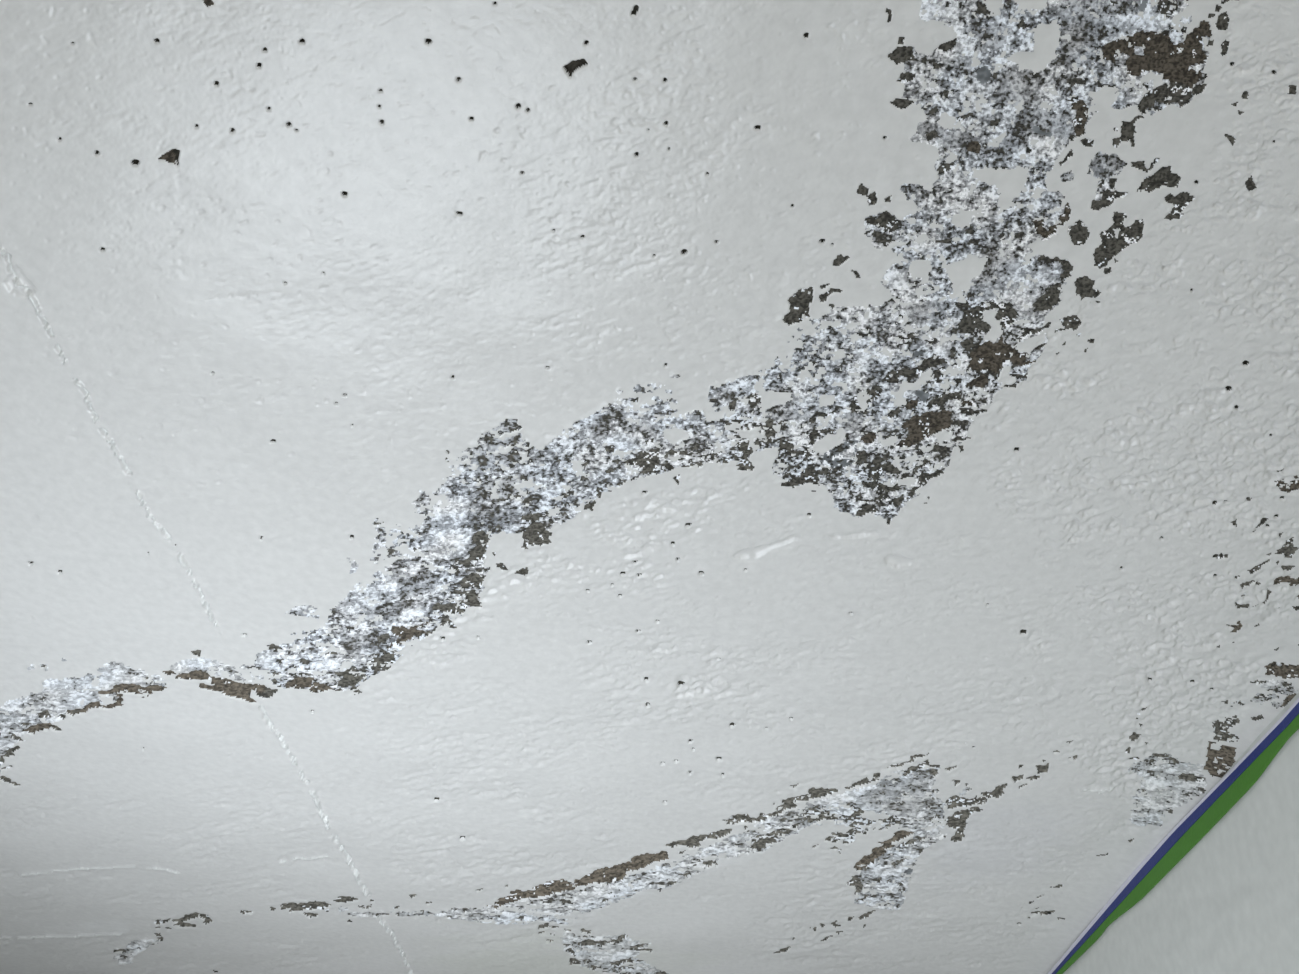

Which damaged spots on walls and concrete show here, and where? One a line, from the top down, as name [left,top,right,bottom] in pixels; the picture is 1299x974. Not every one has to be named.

peeling [0,0,1239,786]
peeling [1274,469,1299,493]
peeling [1217,532,1299,648]
peeling [1125,647,1299,842]
peeling [113,912,212,965]
peeling [270,740,1078,974]